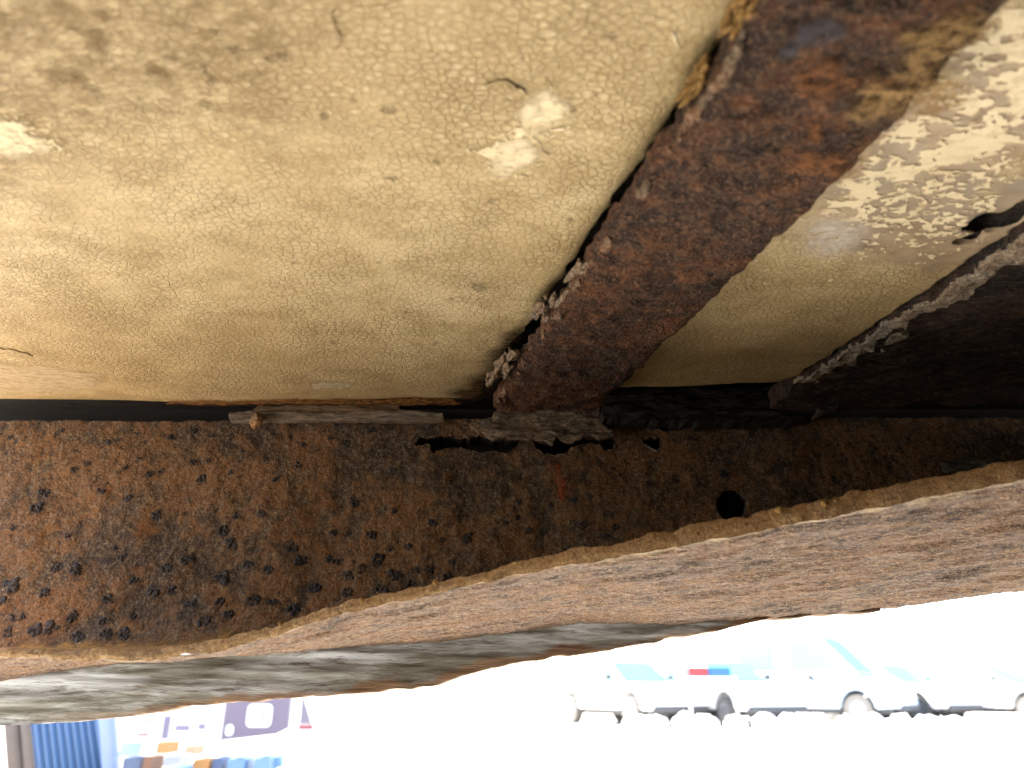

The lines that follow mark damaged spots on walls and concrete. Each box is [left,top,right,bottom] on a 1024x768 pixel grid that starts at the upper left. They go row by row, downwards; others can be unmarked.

crack [331,10,342,49]
rust [794,15,991,124]
peeling [0,115,64,155]
peeling [466,91,580,181]
rust [788,125,862,178]
peeling [799,7,1024,281]
spalling [415,434,519,470]
spalling [532,438,616,466]